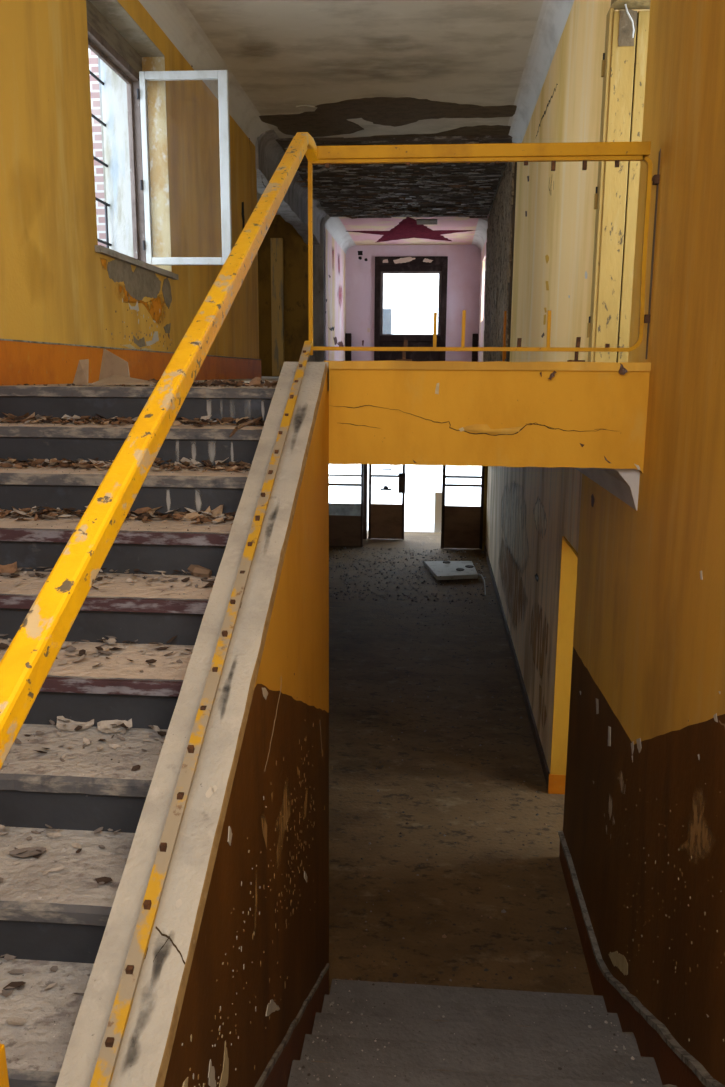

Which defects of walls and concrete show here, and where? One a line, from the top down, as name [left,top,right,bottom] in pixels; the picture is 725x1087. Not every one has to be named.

spalling [259,97,517,138]
spalling [107,259,172,311]
spalling [122,320,171,350]
crack [334,405,612,436]